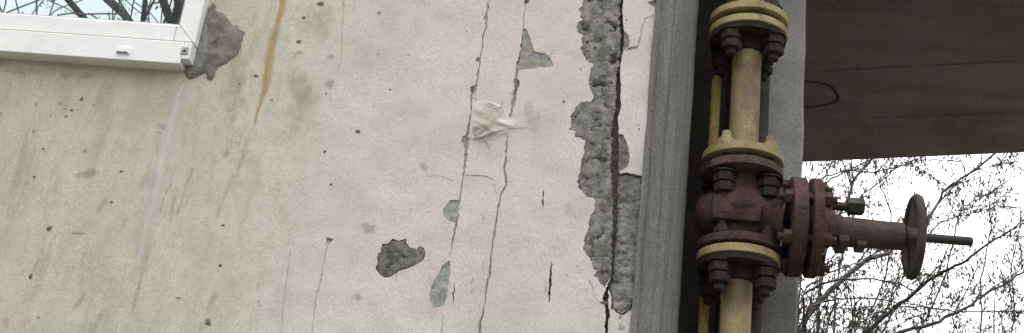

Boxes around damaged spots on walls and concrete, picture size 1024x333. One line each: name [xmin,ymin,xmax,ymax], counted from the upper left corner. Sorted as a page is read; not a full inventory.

corrosion [255,0,285,122]
peeling [517,29,553,71]
peeling [469,98,536,148]
crack [428,0,530,333]
spalling [569,0,642,330]
peeling [442,200,460,223]
crack [312,237,333,331]
spalling [376,239,425,278]
peeling [429,261,450,309]
crack [588,271,613,333]